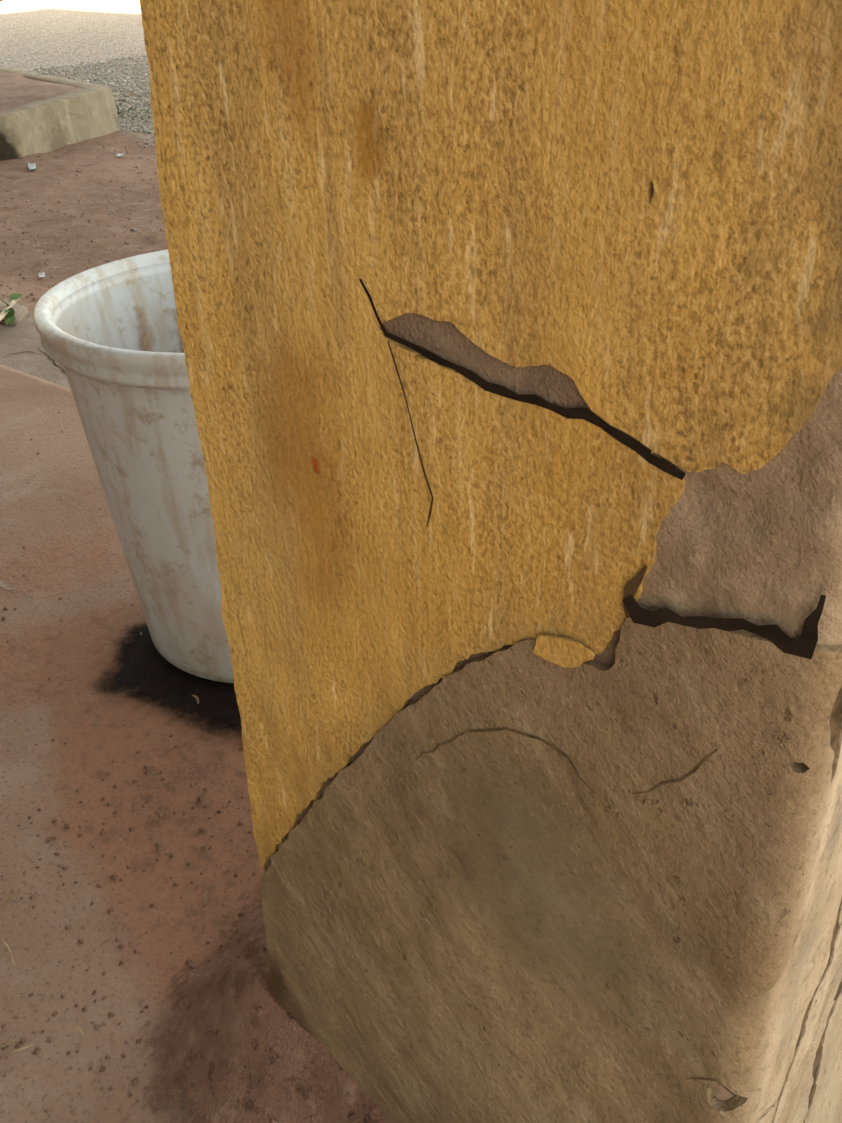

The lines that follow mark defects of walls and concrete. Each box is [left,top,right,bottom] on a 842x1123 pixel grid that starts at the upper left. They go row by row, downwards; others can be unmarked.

crack [359,278,686,527]
flaking render [622,367,842,659]
flaking render [533,634,595,668]
crack [829,685,842,776]
crack [686,1078,736,1096]
crack [759,898,842,1123]